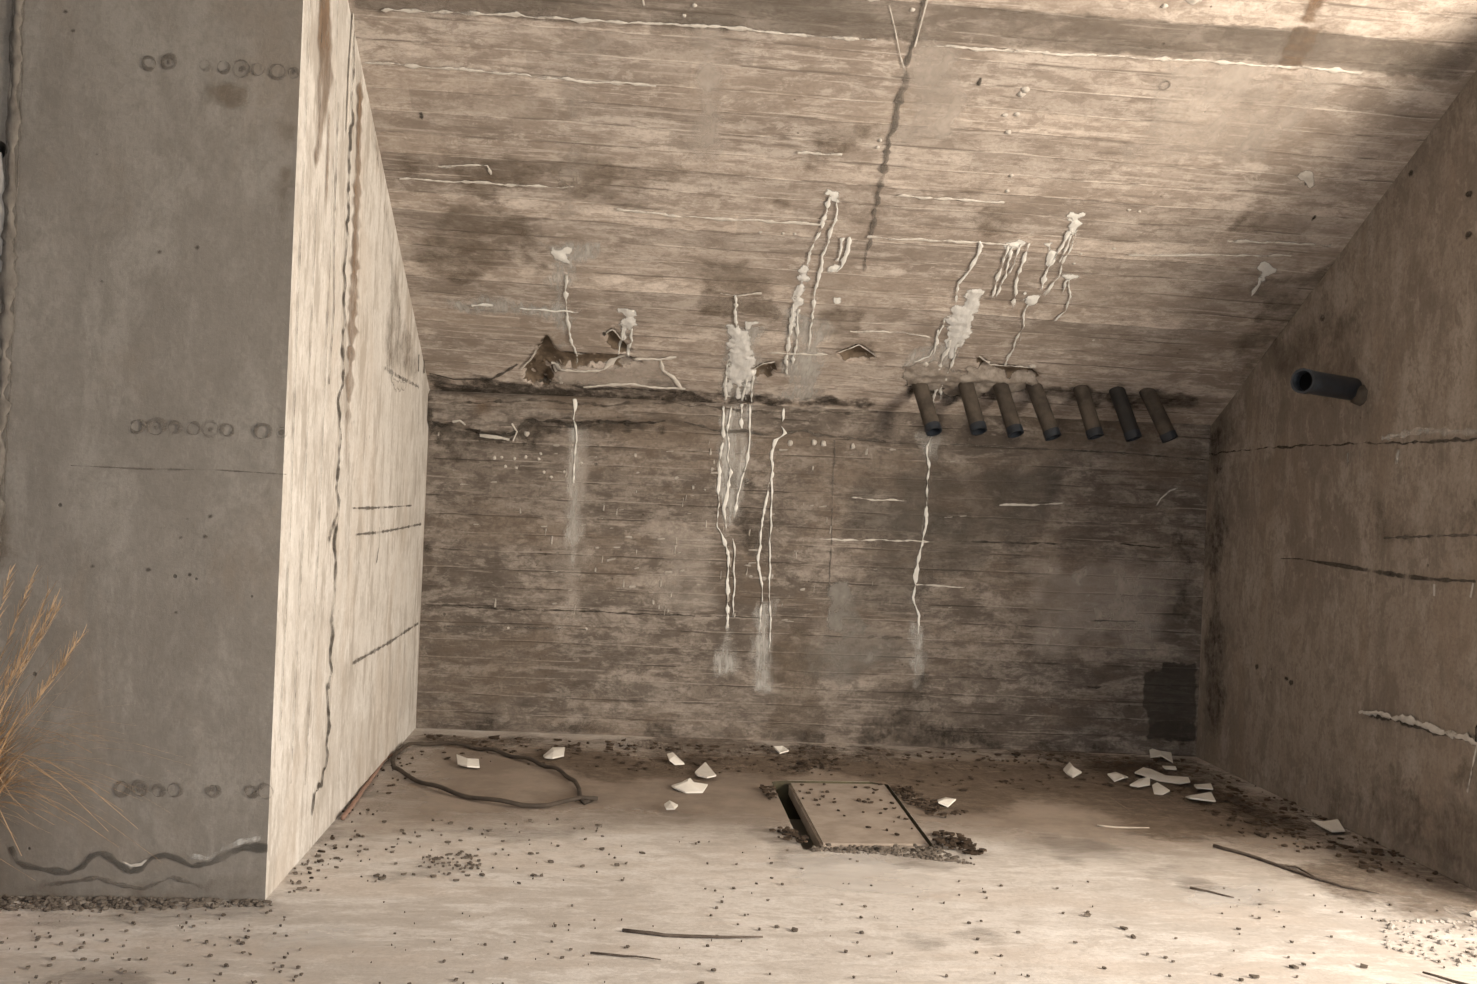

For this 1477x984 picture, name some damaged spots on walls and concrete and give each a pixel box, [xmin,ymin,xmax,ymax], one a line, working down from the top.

crack [864,0,928,268]
leakage [912,212,1085,401]
spalling [430,329,810,406]
leakage [425,189,876,689]
crack [418,360,928,589]
leakage [859,441,1002,748]
crack [965,539,1056,547]
crack [1000,500,1063,508]
crack [950,435,1477,505]
crack [1281,534,1477,598]
crack [1358,710,1477,793]